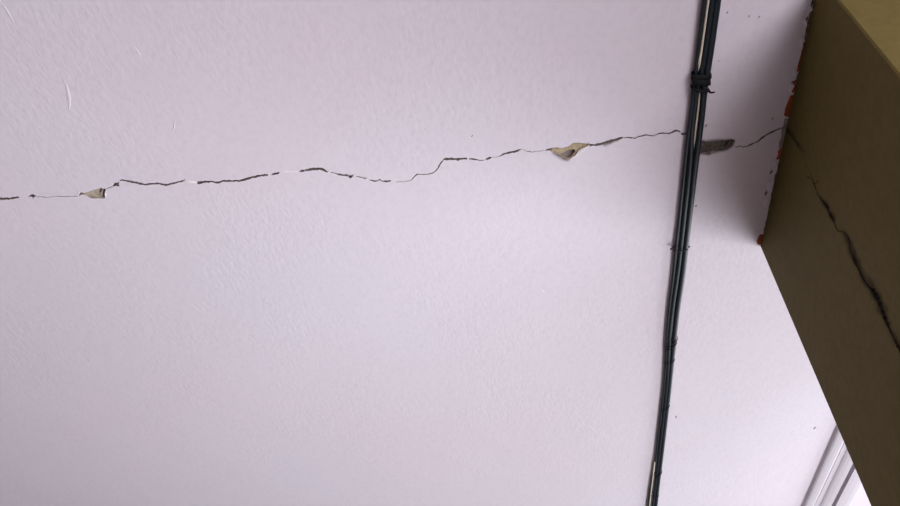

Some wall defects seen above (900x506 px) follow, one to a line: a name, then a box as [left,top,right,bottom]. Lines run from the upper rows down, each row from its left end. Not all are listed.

flaking render [550,143,589,160]
crack [589,130,686,146]
flaking render [701,139,734,152]
crack [106,148,550,189]
crack [0,192,77,200]
flaking render [77,187,106,199]
crack [738,125,900,353]